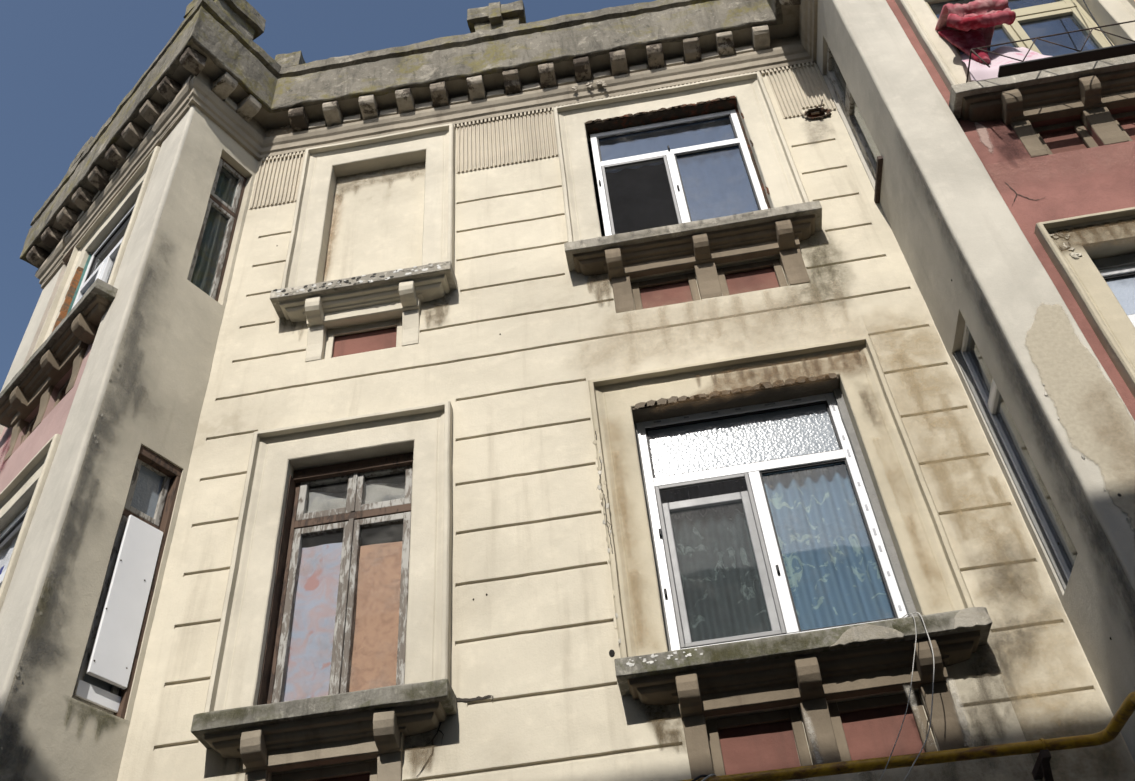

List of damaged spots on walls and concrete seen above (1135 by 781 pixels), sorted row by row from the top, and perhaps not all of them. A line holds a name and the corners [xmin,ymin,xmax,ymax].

water stain [1057,217,1135,249]
water stain [0,268,156,781]
crack [595,431,613,554]
water stain [959,251,1135,633]
peeling [1026,304,1135,531]
crack [416,722,444,777]